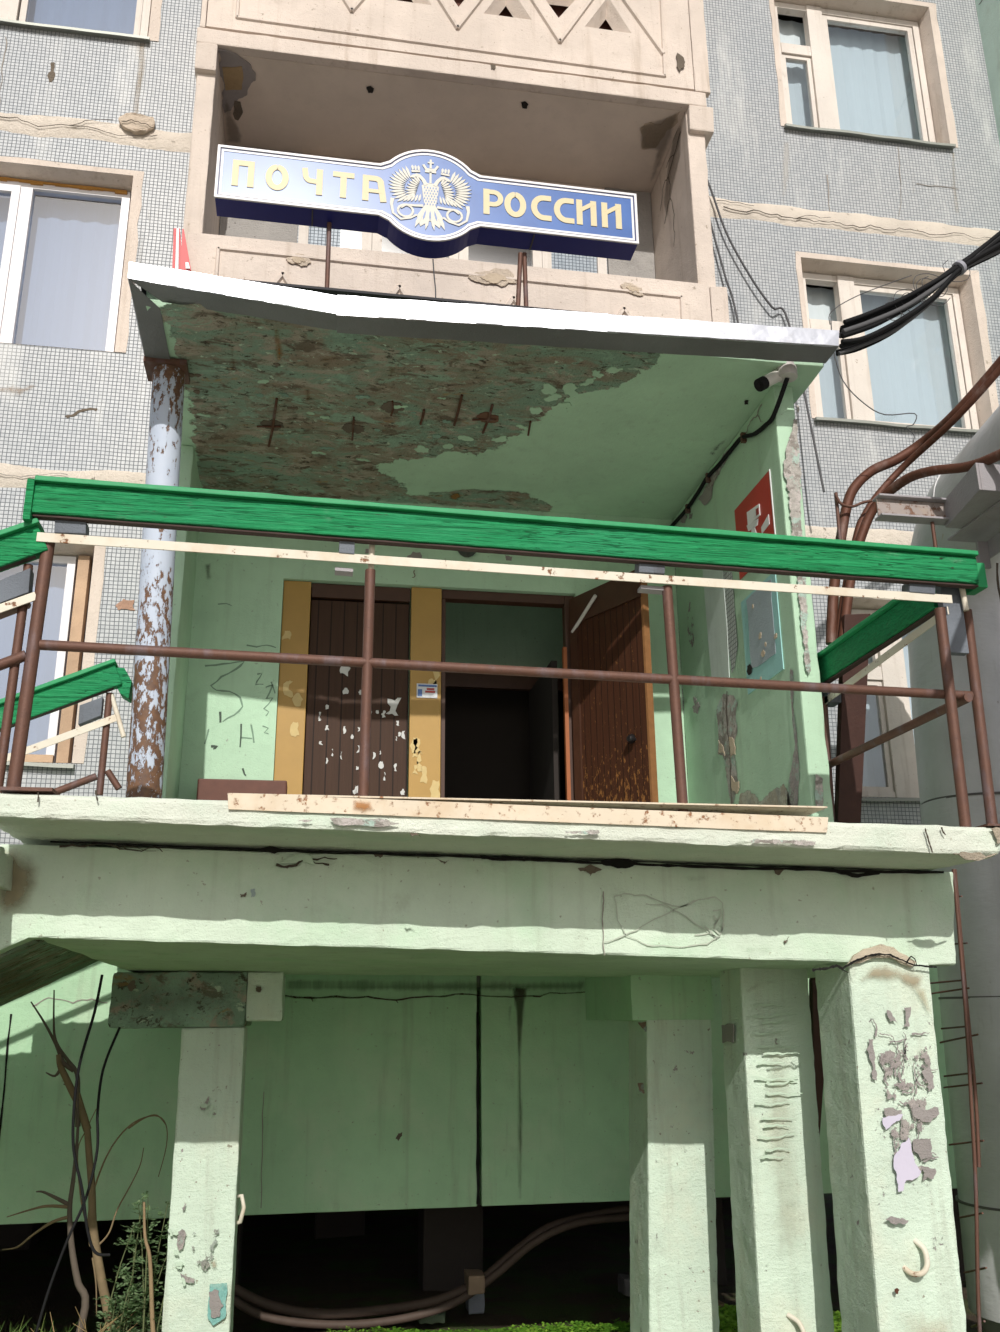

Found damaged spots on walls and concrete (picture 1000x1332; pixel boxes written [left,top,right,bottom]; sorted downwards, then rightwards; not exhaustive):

spalling [218,49,256,120]
peeling [160,303,663,512]
peeling [783,404,803,537]
peeling [723,571,776,673]
peeling [787,576,811,806]
peeling [717,693,739,804]
peeling [815,774,823,806]
leakage [514,988,525,1052]
spalling [866,852,997,1332]